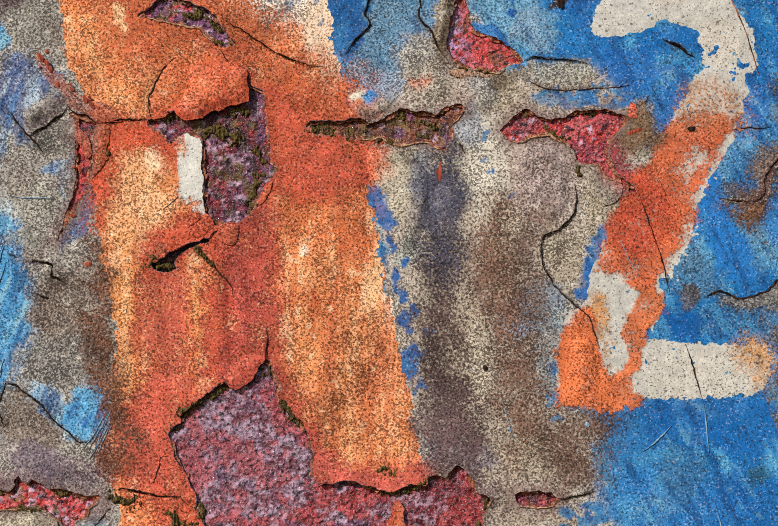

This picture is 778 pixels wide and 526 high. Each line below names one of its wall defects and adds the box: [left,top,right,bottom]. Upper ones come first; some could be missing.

peeling [138,0,236,47]
crack [347,0,371,52]
crack [418,0,446,57]
peeling [446,0,523,78]
peeling [140,54,278,272]
peeling [306,104,465,151]
peeling [500,102,642,206]
crack [541,184,600,349]
crack [639,194,669,288]
peeling [707,279,778,428]
peeling [169,354,493,526]
peeling [0,476,99,526]